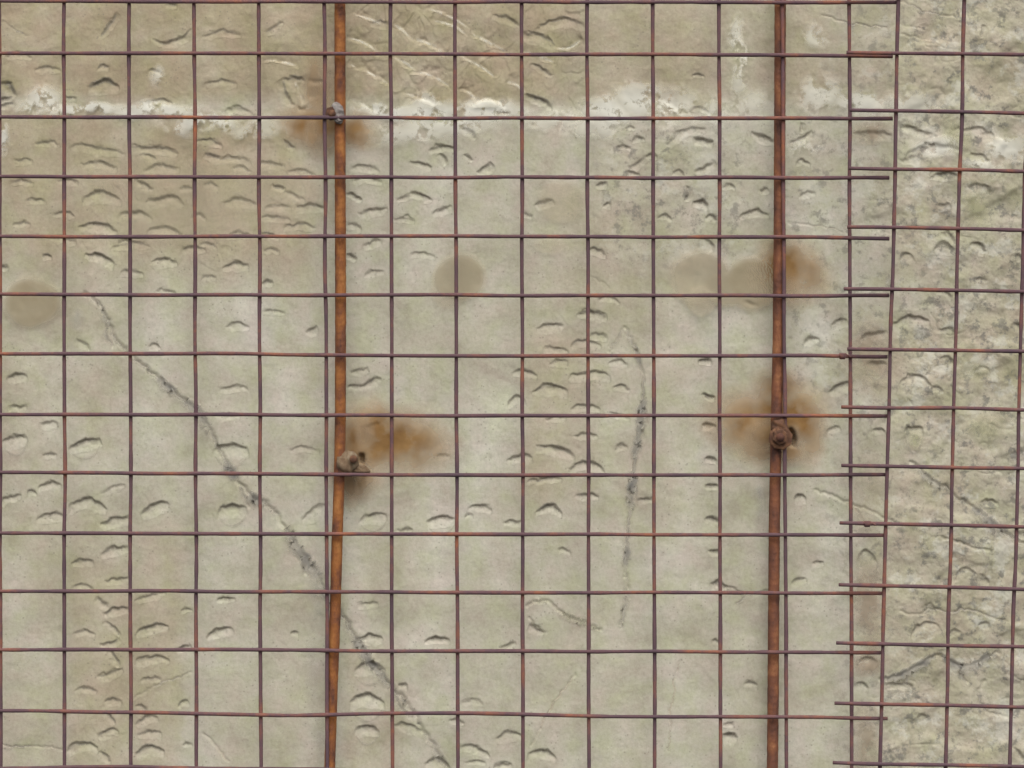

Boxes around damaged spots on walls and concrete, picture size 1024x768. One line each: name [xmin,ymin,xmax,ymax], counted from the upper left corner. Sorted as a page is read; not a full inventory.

water stain [25,89,231,131]
water stain [359,96,518,137]
water stain [590,86,685,132]
water stain [805,86,879,109]
water stain [6,279,59,327]
water stain [435,256,483,299]
water stain [676,255,773,309]
corrosion [722,374,821,460]
corrosion [344,405,442,496]
crack [615,343,646,564]
crack [134,359,402,709]